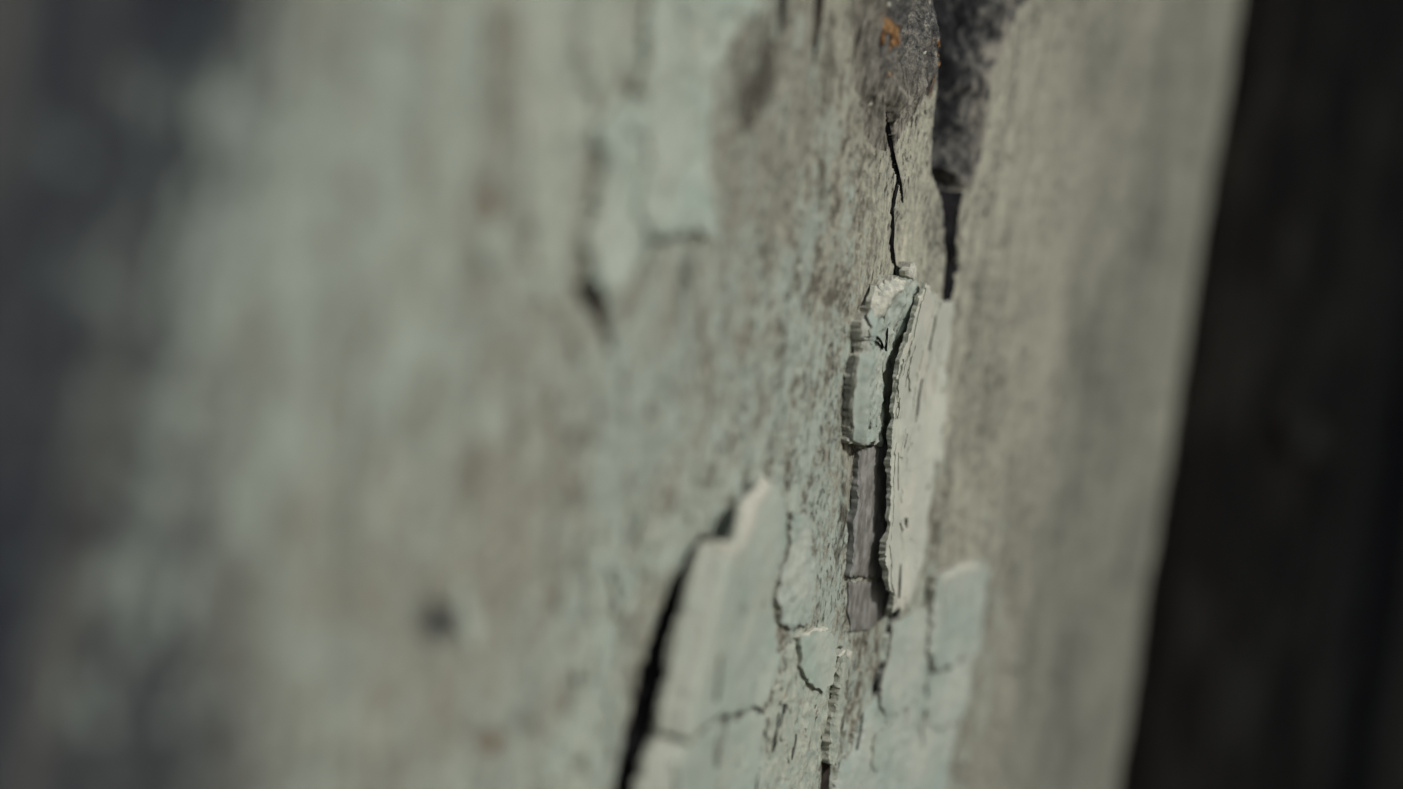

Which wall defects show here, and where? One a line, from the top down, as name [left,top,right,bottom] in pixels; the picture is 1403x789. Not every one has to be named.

crack [885,112,903,275]
crack [939,190,964,301]
peeling [632,261,991,789]
crack [614,533,705,789]